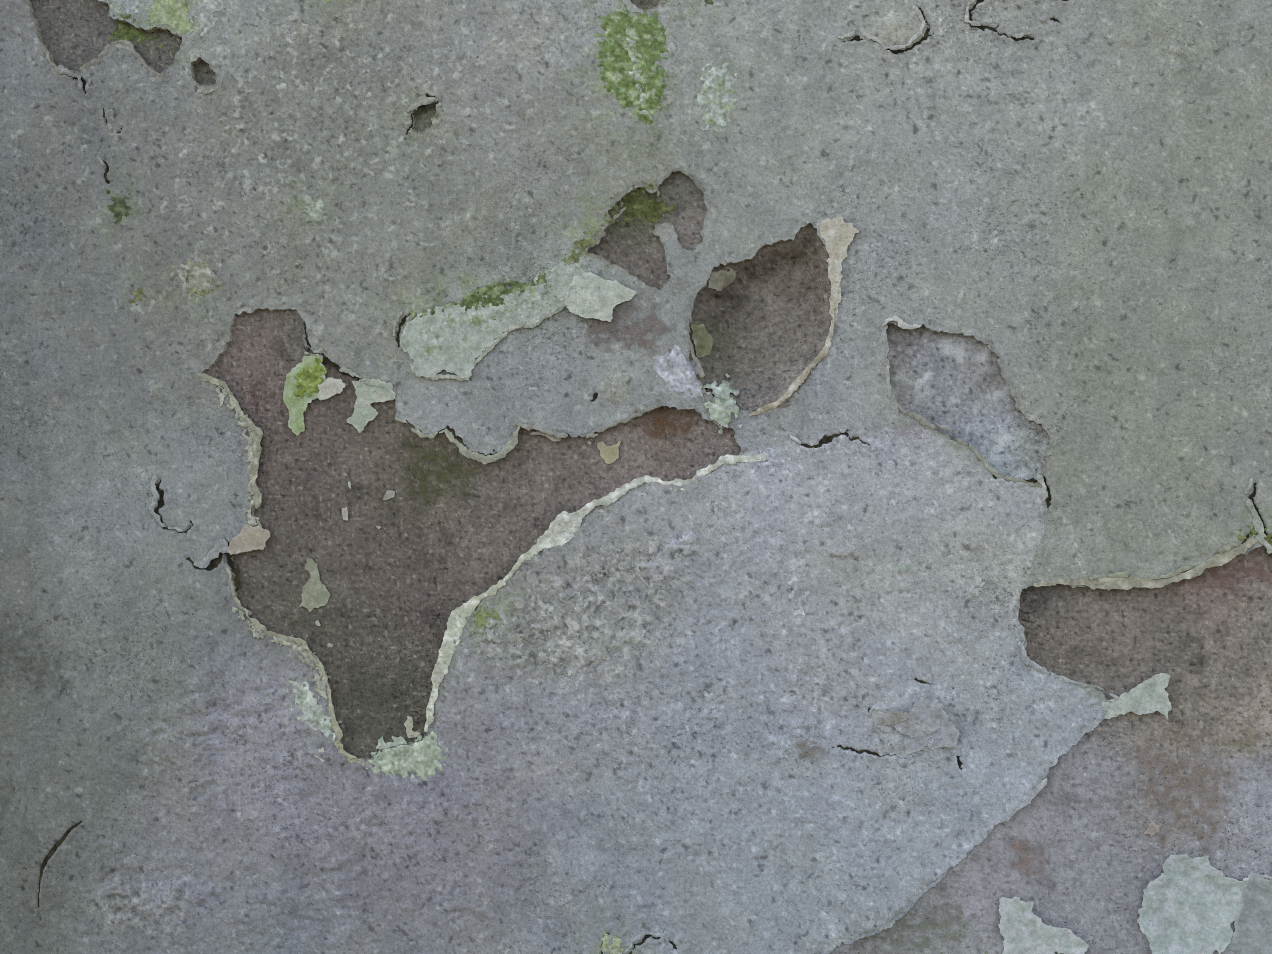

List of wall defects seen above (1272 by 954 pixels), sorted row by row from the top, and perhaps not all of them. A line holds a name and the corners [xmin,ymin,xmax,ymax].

peeling [30,0,182,81]
peeling [623,0,660,14]
crack [838,5,932,55]
crack [964,0,1068,41]
peeling [400,167,707,381]
spalling [686,217,859,416]
peeling [882,316,1050,487]
crack [149,474,240,592]
peeling [198,309,799,764]
peeling [821,535,1272,954]
crack [38,821,82,921]